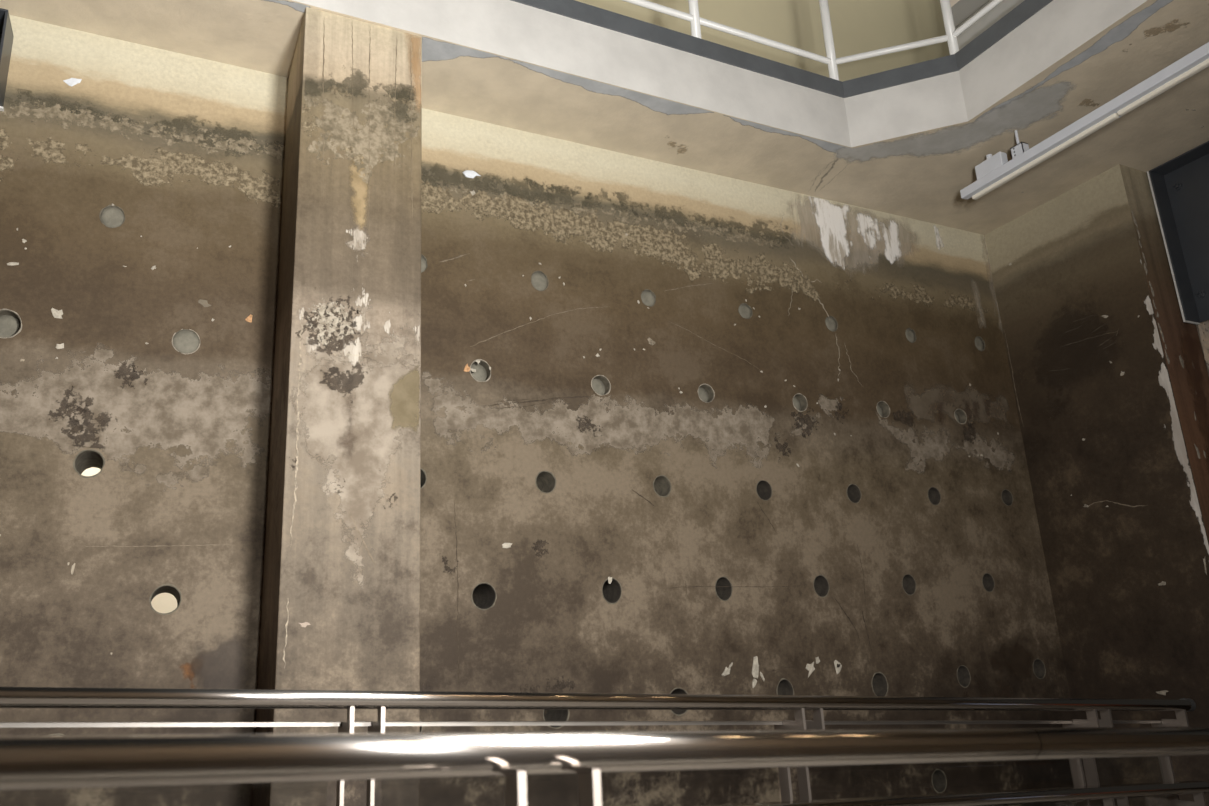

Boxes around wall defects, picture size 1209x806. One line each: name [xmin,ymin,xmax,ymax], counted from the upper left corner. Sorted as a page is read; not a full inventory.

water stain [150,117,271,156]
crack [808,157,846,191]
water stain [421,166,916,269]
peeling [345,225,369,262]
water stain [114,362,148,389]
peeling [1131,210,1209,575]
water stain [48,386,116,449]
peeling [0,343,273,491]
peeling [289,288,852,588]
water stain [576,415,603,436]
spalling [752,656,794,695]
spalling [806,657,842,677]